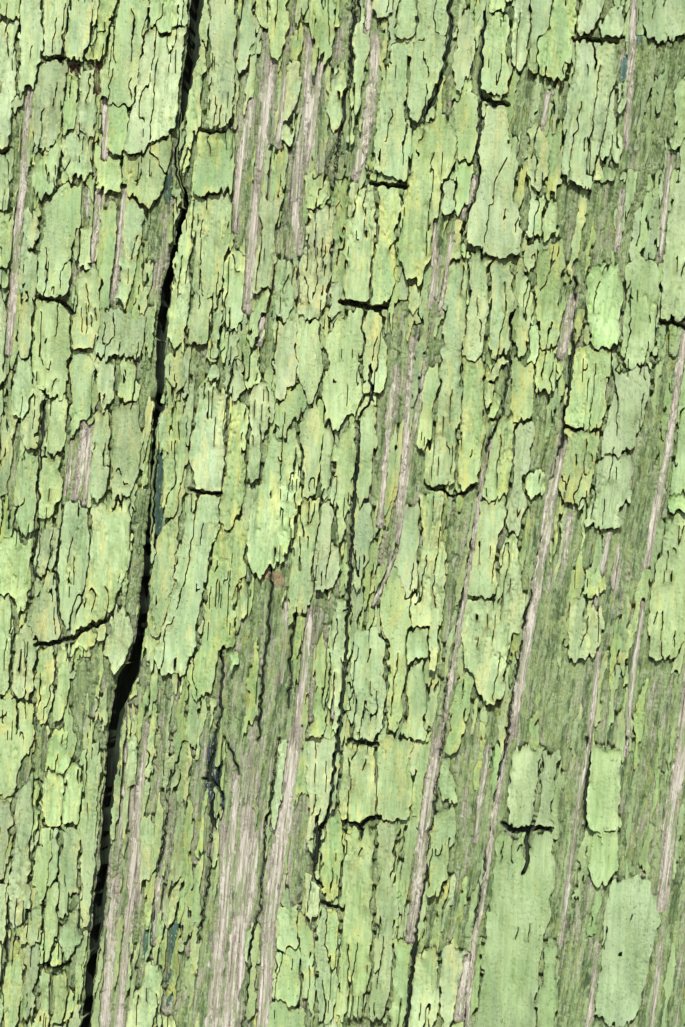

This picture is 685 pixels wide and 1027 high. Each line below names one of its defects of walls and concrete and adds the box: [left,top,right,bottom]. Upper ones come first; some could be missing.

peeling [0,0,189,1027]
crack [31,0,227,1027]
peeling [91,0,624,1027]
crack [468,537,552,976]
crack [552,279,583,478]
peeling [557,77,685,671]
peeling [561,324,685,1027]
peeling [598,0,685,142]
peeling [637,44,670,164]